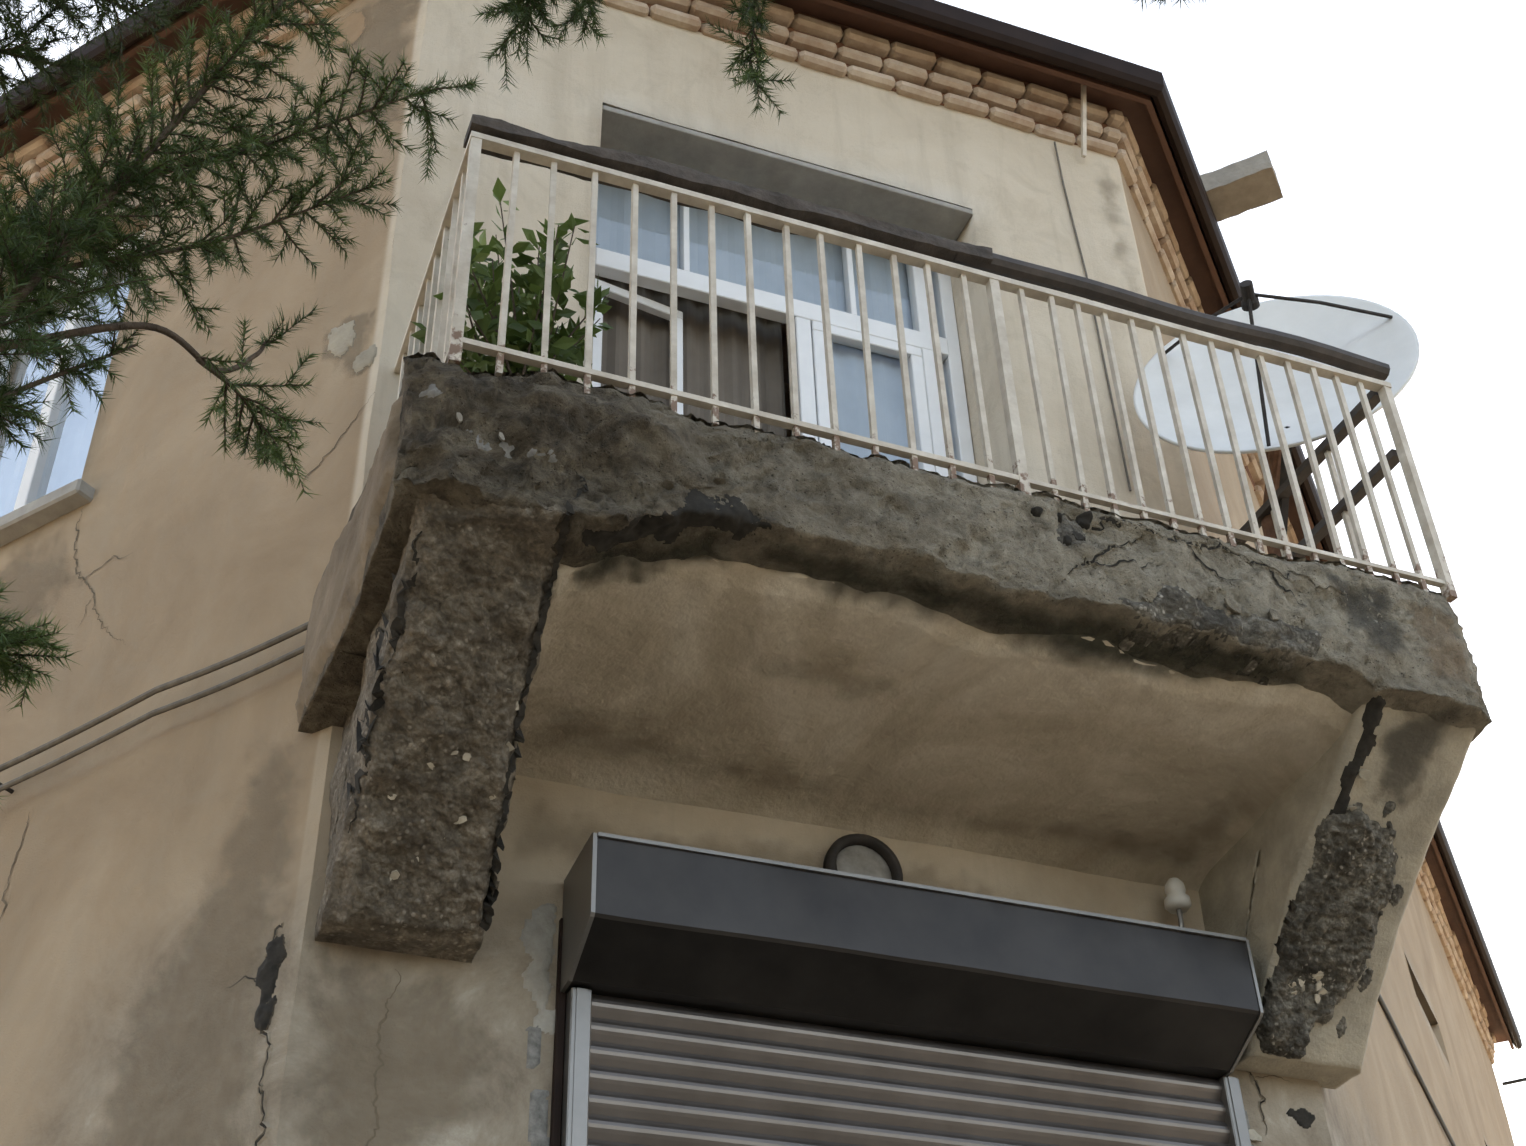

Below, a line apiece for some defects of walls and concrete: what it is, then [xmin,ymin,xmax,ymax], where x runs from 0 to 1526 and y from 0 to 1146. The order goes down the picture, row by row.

crack [73,510,128,641]
spalling [582,477,772,553]
spalling [1031,506,1093,548]
crack [1057,509,1343,606]
spalling [335,498,567,935]
spalling [1255,695,1404,1059]
crack [229,922,287,1146]
spalling [1286,1108,1315,1129]